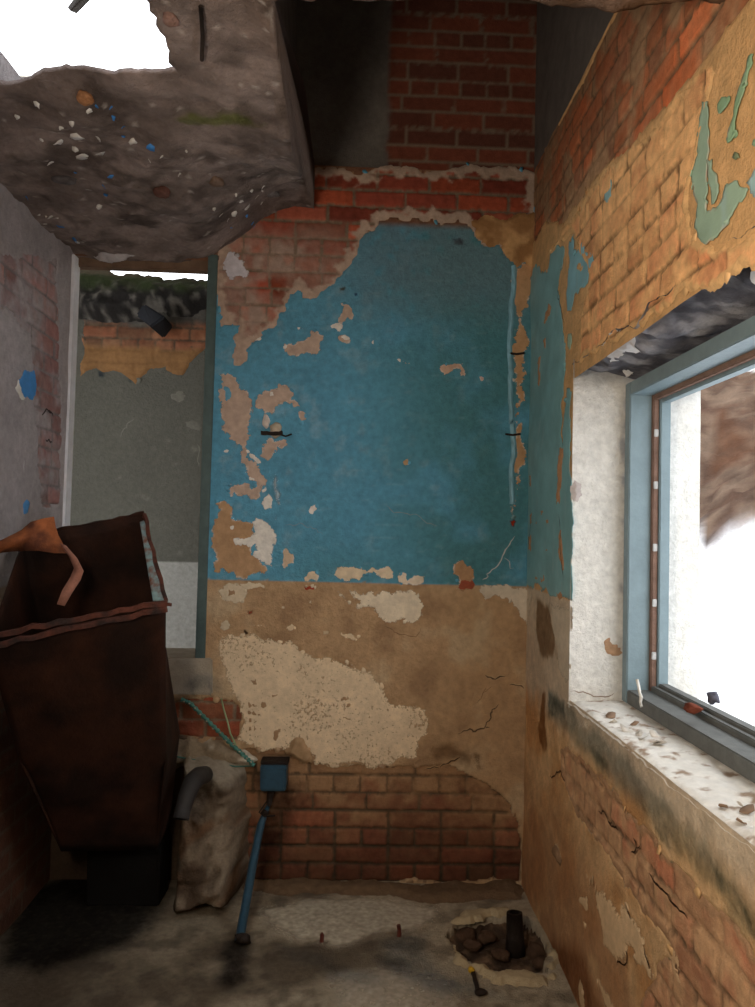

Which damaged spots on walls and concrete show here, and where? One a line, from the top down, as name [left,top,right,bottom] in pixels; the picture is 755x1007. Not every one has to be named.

peeling [40,121,105,160]
spalling [0,251,62,514]
spalling [80,0,755,683]
spalling [175,620,521,883]
crack [426,675,524,770]
crack [599,810,640,854]
spalling [559,747,755,1007]
crack [649,873,687,918]